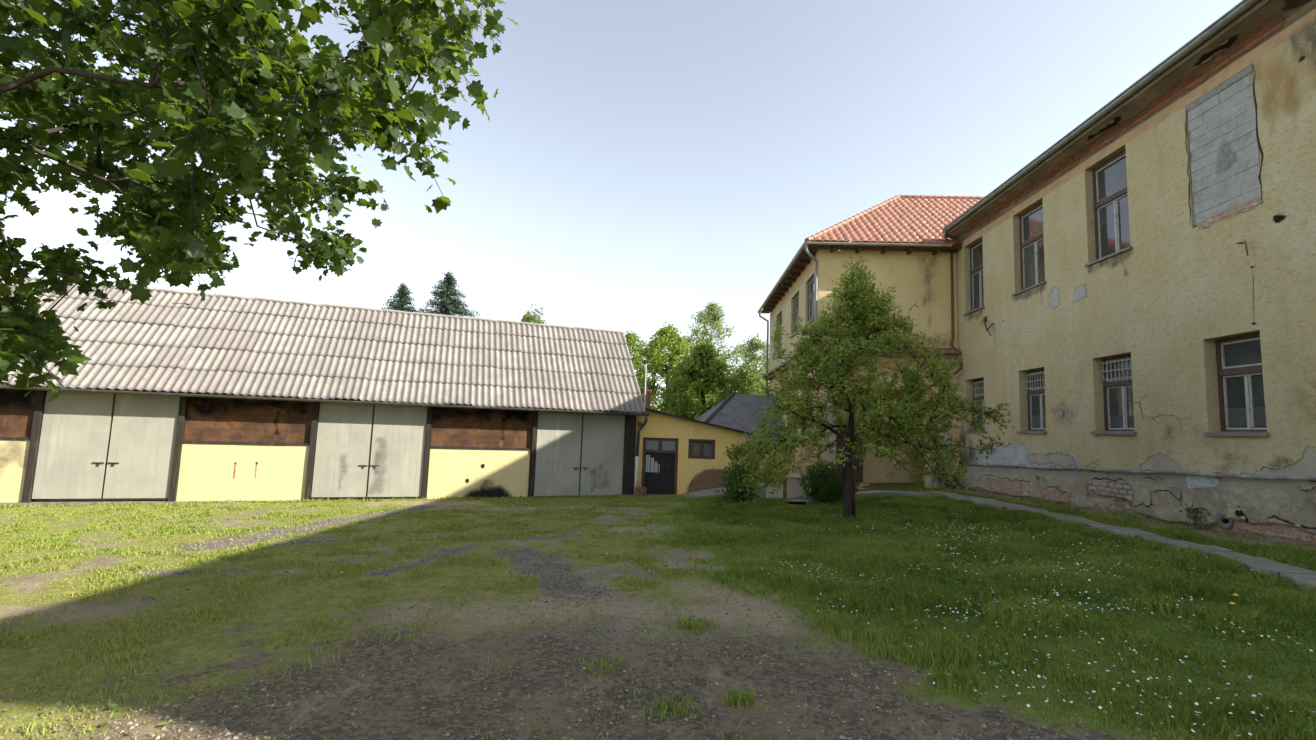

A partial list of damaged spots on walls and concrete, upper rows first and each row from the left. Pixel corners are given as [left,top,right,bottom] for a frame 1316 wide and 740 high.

spalling [965,0,1310,231]
flaking render [961,441,1081,493]
flaking render [1139,450,1220,490]
flaking render [1241,442,1316,494]
spalling [1231,506,1313,541]
crack [1268,515,1316,530]